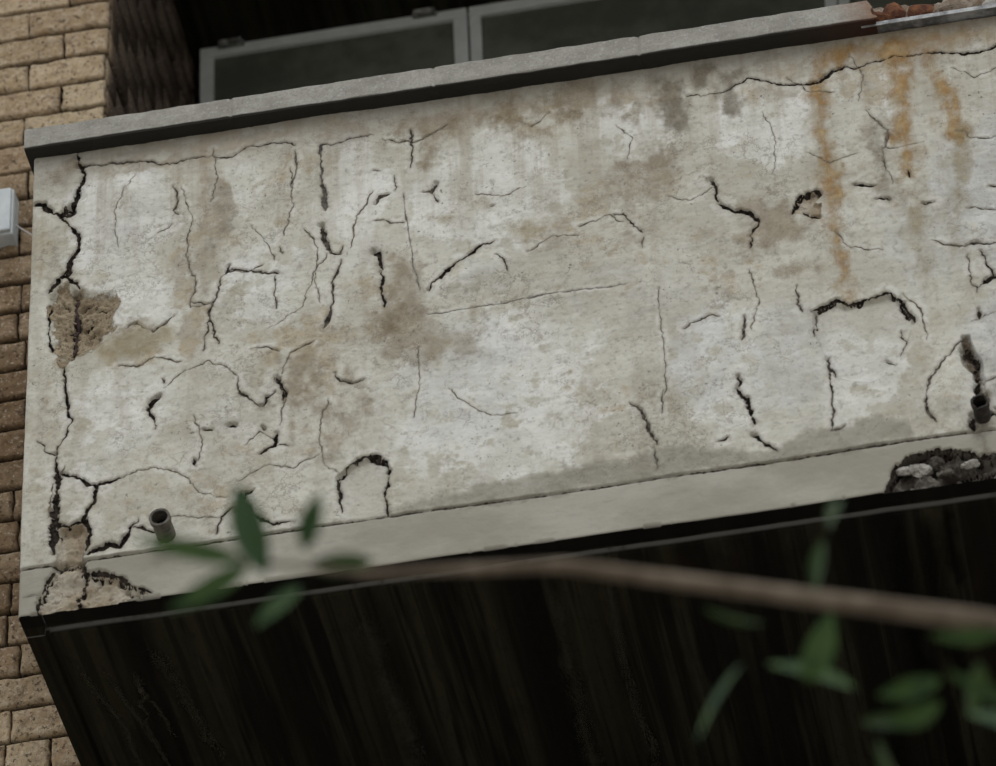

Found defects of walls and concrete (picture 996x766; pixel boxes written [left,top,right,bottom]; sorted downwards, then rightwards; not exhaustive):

damp [661,81,686,131]
rust [814,128,843,199]
crack [687,45,996,201]
rust [879,40,912,175]
rust [936,78,964,143]
crack [530,213,644,251]
crack [668,182,760,340]
spalling [46,281,121,368]
crack [23,125,625,574]
crack [321,240,996,527]
spalling [884,448,996,493]
spalling [36,523,151,616]